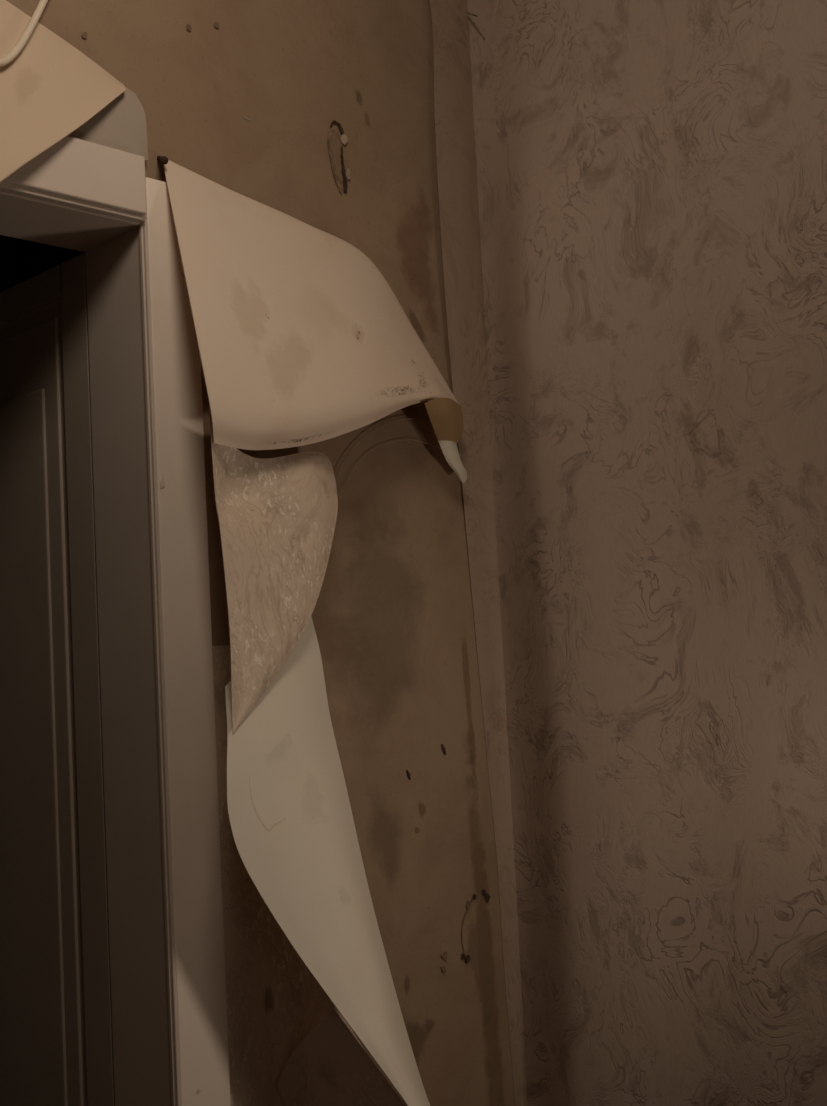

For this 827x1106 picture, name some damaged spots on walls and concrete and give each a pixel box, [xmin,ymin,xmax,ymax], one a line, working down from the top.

flaking render [327,120,350,194]